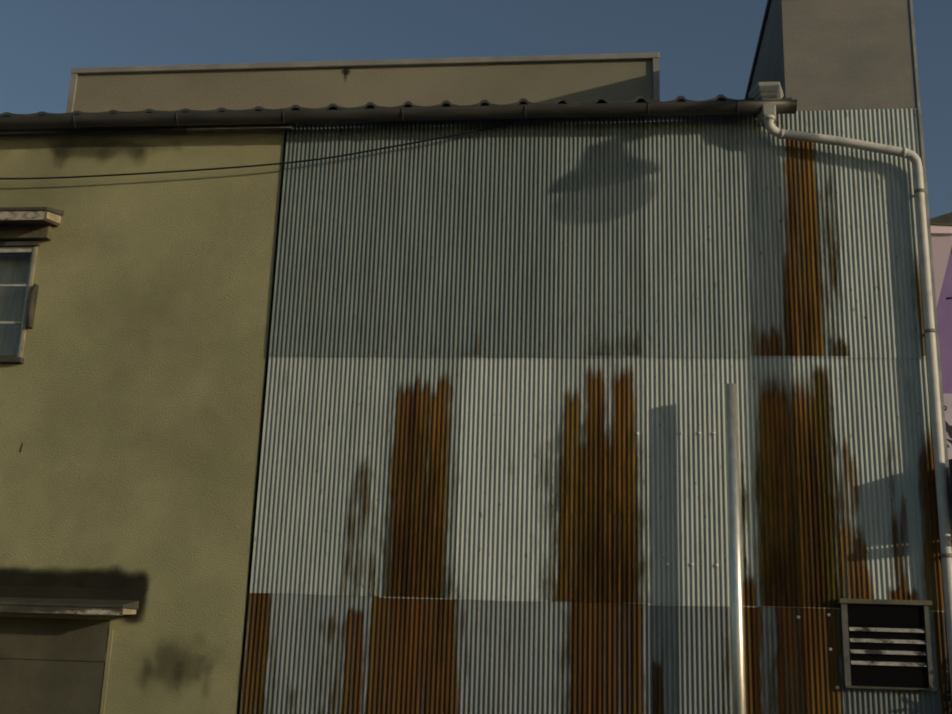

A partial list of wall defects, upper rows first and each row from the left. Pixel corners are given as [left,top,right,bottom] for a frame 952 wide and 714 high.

corrosion [753,132,849,356]
corrosion [241,593,274,714]
corrosion [322,375,459,714]
corrosion [541,370,664,714]
corrosion [741,369,874,714]